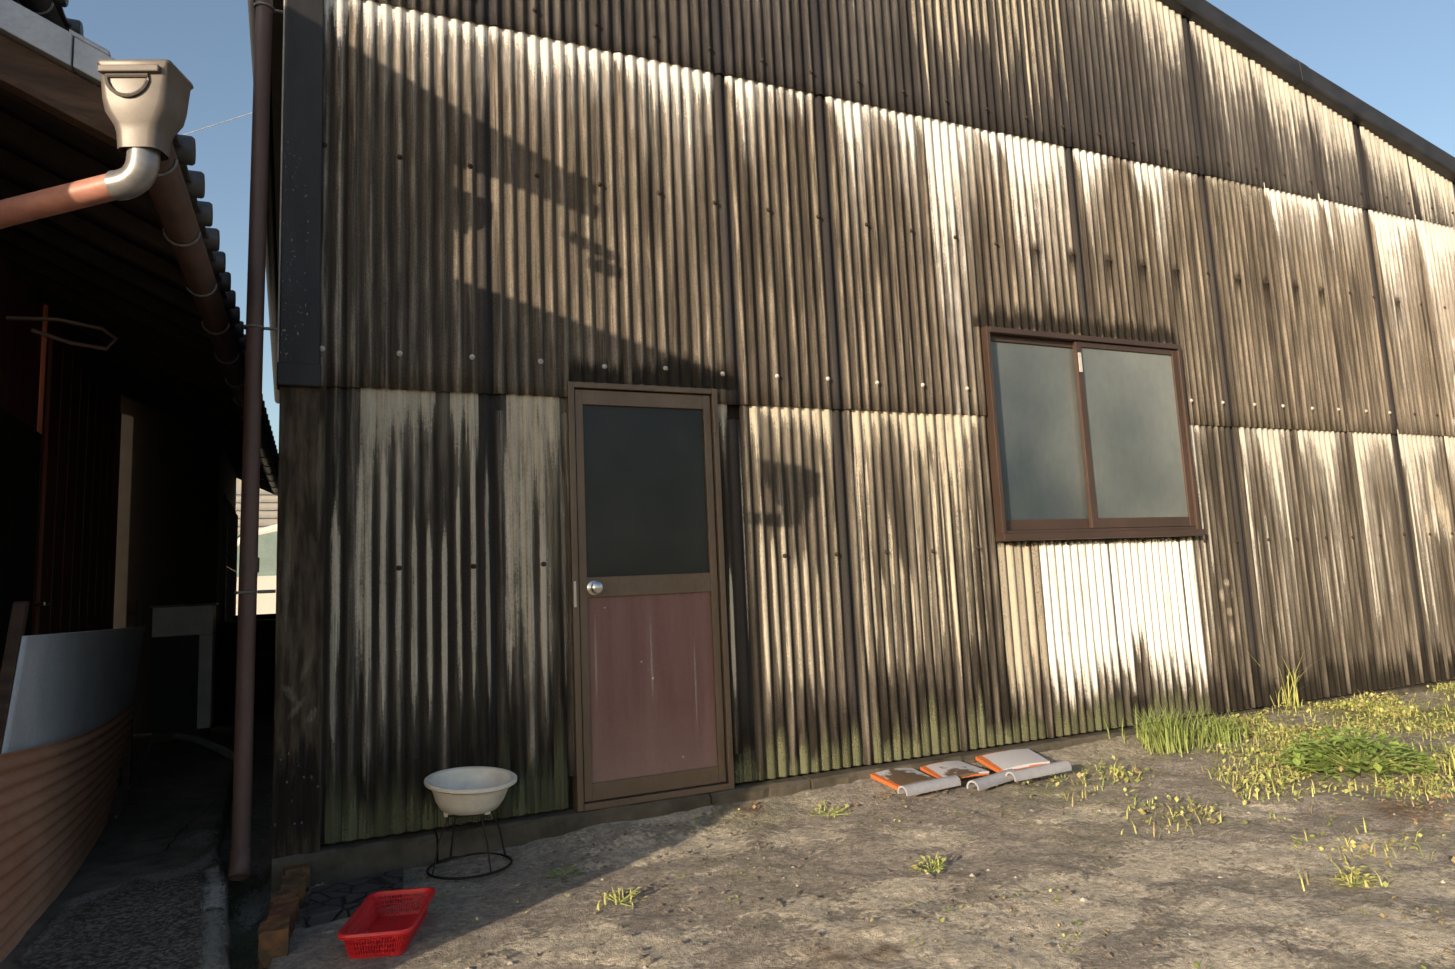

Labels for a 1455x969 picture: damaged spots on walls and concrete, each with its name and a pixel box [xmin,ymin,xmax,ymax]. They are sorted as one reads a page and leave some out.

damp [324,0,1107,305]
damp [1103,0,1455,308]
damp [569,353,737,436]
damp [973,301,1176,344]
damp [273,388,569,853]
damp [738,405,1455,782]
damp [196,867,271,969]